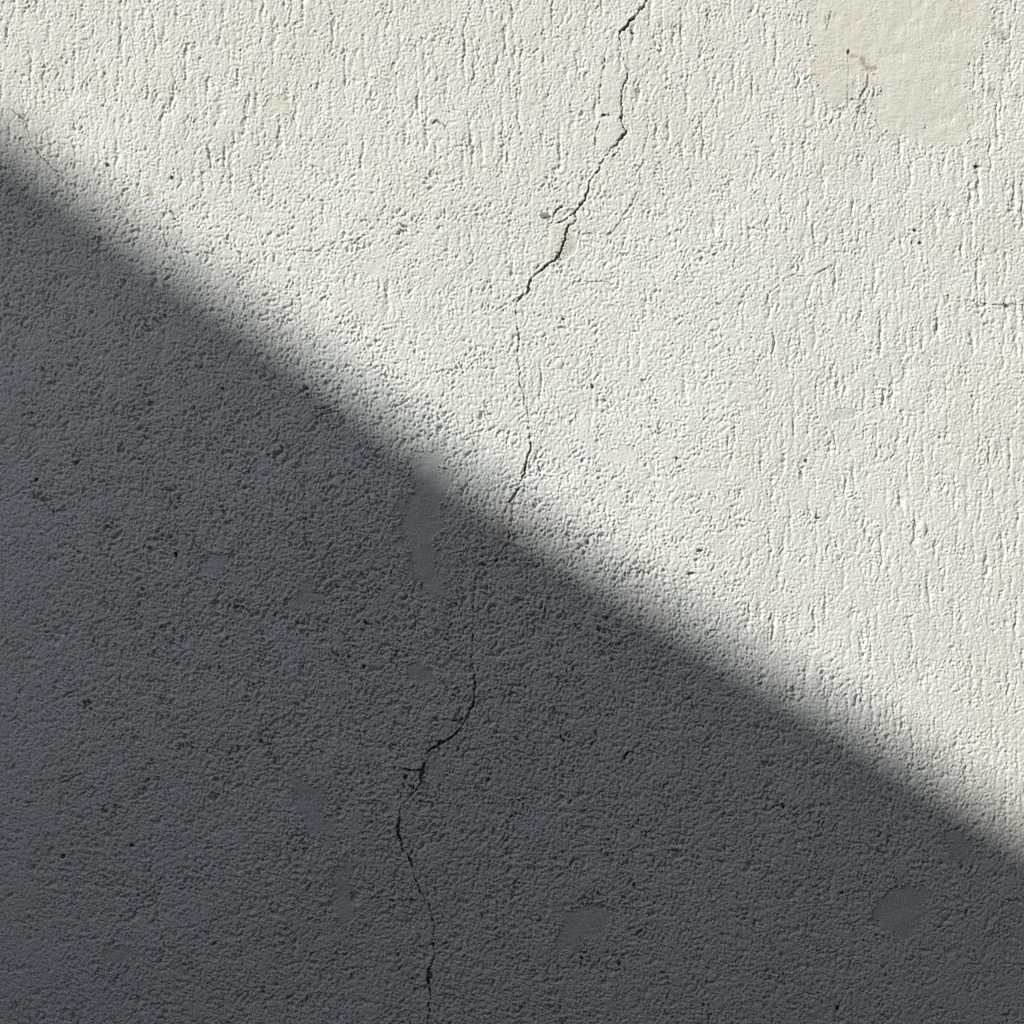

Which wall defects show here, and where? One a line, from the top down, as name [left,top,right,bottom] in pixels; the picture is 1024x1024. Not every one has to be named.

crack [396,0,648,1024]